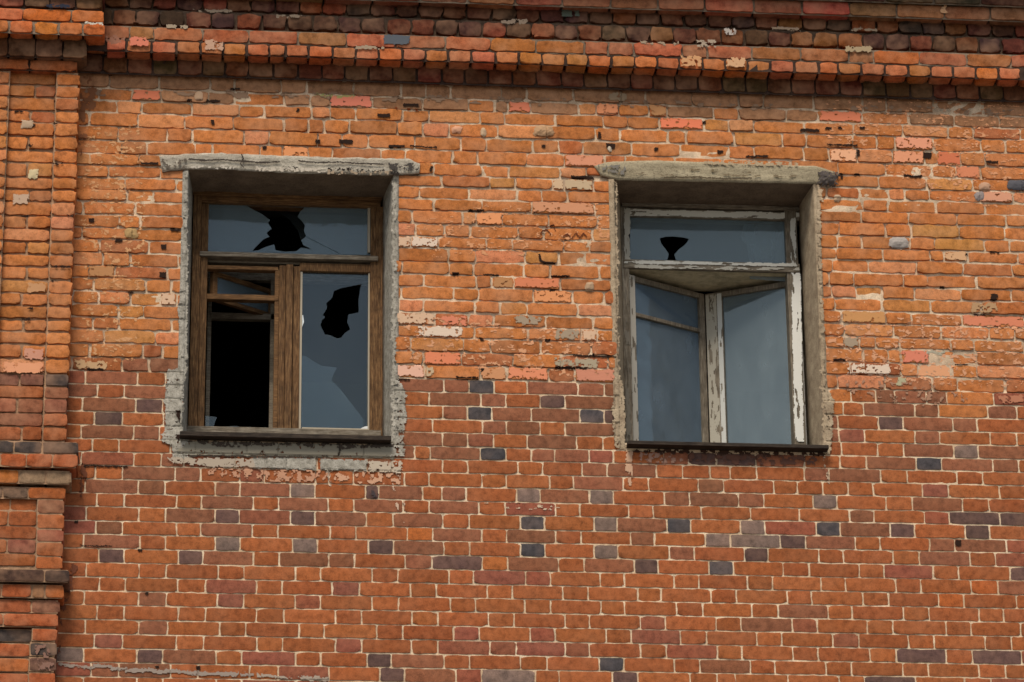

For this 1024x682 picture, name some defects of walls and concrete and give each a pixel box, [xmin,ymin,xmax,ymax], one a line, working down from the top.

spalling [476,213,502,225]
spalling [399,236,438,247]
spalling [493,277,571,302]
spalling [397,313,434,325]
peeling [623,208,804,442]
spalling [582,330,597,341]
spalling [398,351,461,378]
spalling [901,350,950,377]
spalling [480,367,548,380]
spalling [576,369,615,382]
spalling [997,394,1023,404]